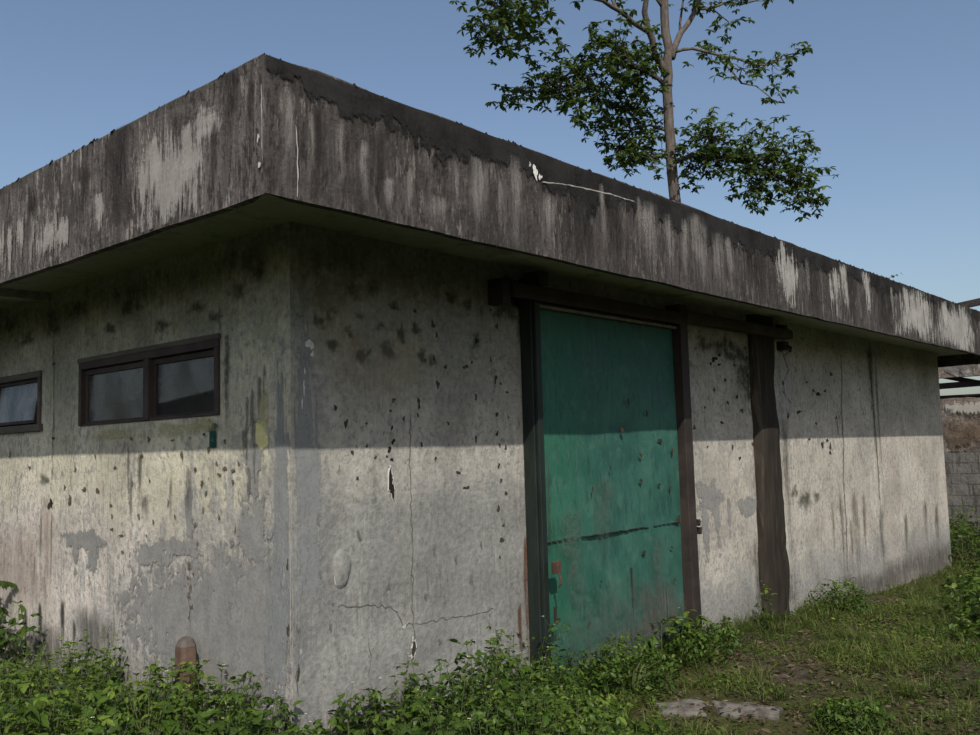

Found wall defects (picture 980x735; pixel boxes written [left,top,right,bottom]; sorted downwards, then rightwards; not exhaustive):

water stain [361,145,392,200]
spalling [374,416,405,501]
water stain [783,424,819,504]
peeling [58,528,106,587]
peeling [112,341,292,734]
crack [338,415,494,672]
peeling [696,478,757,561]